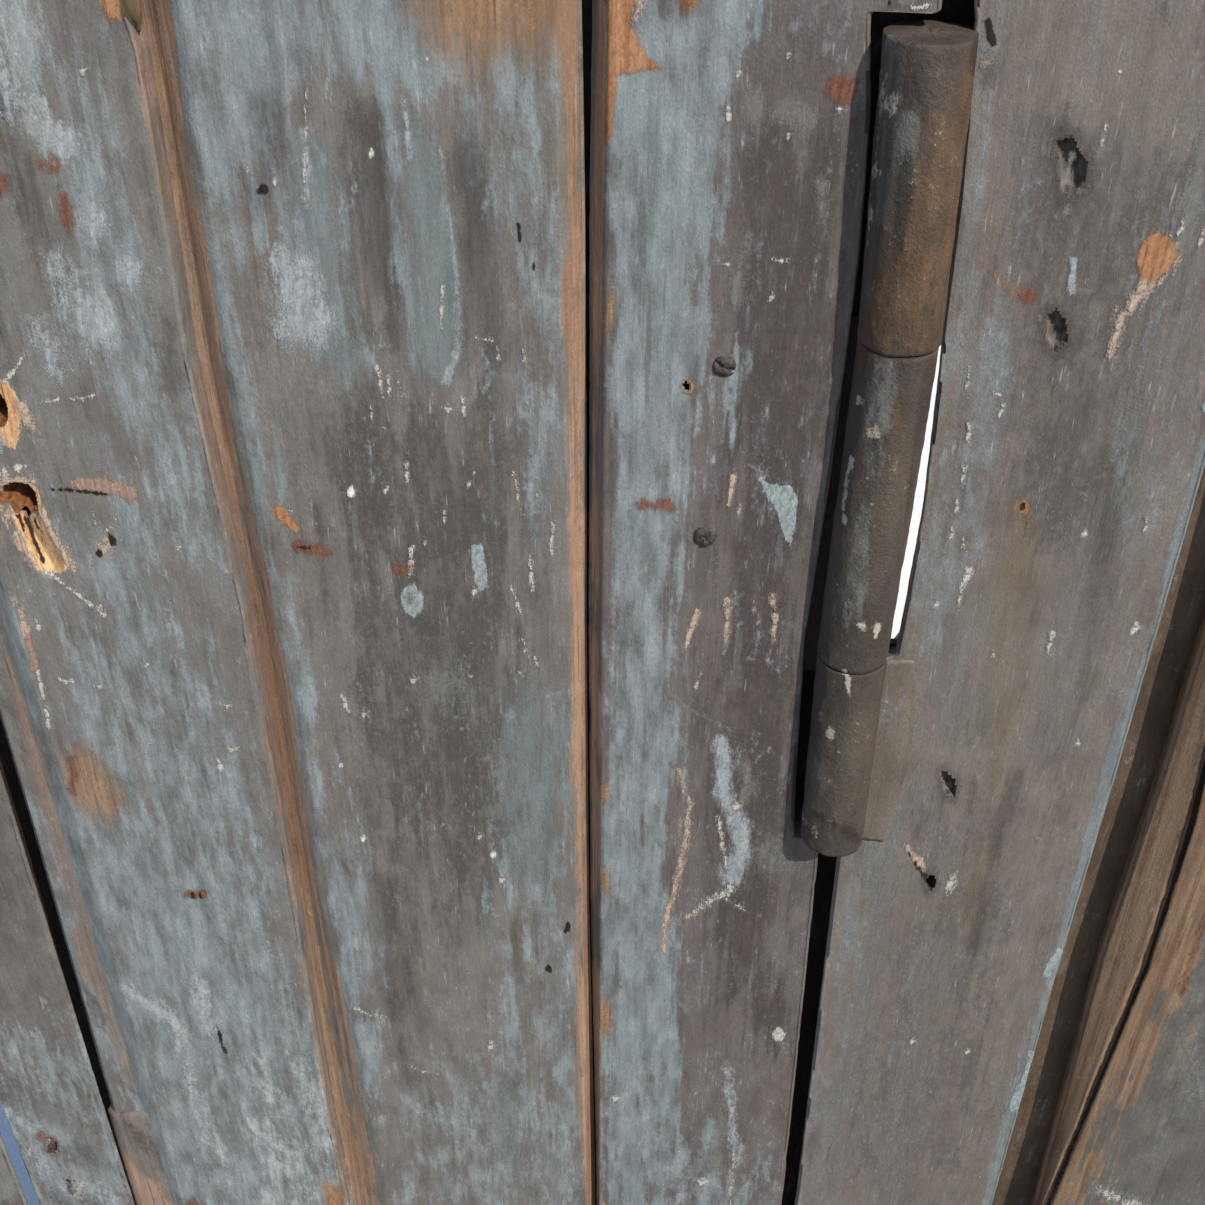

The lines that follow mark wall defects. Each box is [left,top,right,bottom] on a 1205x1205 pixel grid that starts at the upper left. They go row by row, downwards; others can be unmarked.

peeling [99,0,121,21]
peeling [604,0,661,146]
rust [826,77,858,112]
spalling [1055,134,1088,195]
peeling [1106,231,1183,361]
spalling [1045,307,1069,352]
crack [1047,747,1205,1205]